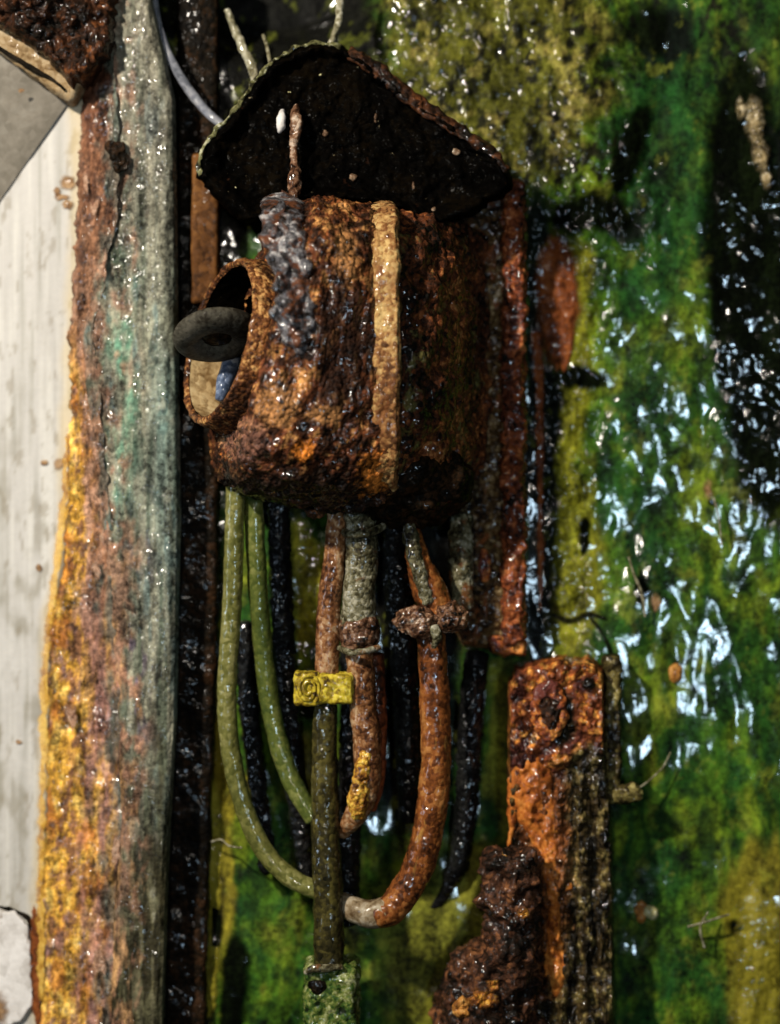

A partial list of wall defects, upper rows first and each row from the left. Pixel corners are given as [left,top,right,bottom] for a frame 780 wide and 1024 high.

damp [633,6,667,54]
damp [551,105,650,234]
damp [703,60,780,527]
rust [531,235,579,611]
damp [556,364,607,389]
rust [0,0,122,1024]
damp [578,516,590,555]
rust [347,750,371,820]
rust [506,757,573,998]
rust [452,981,499,1019]
damp [736,883,780,1024]